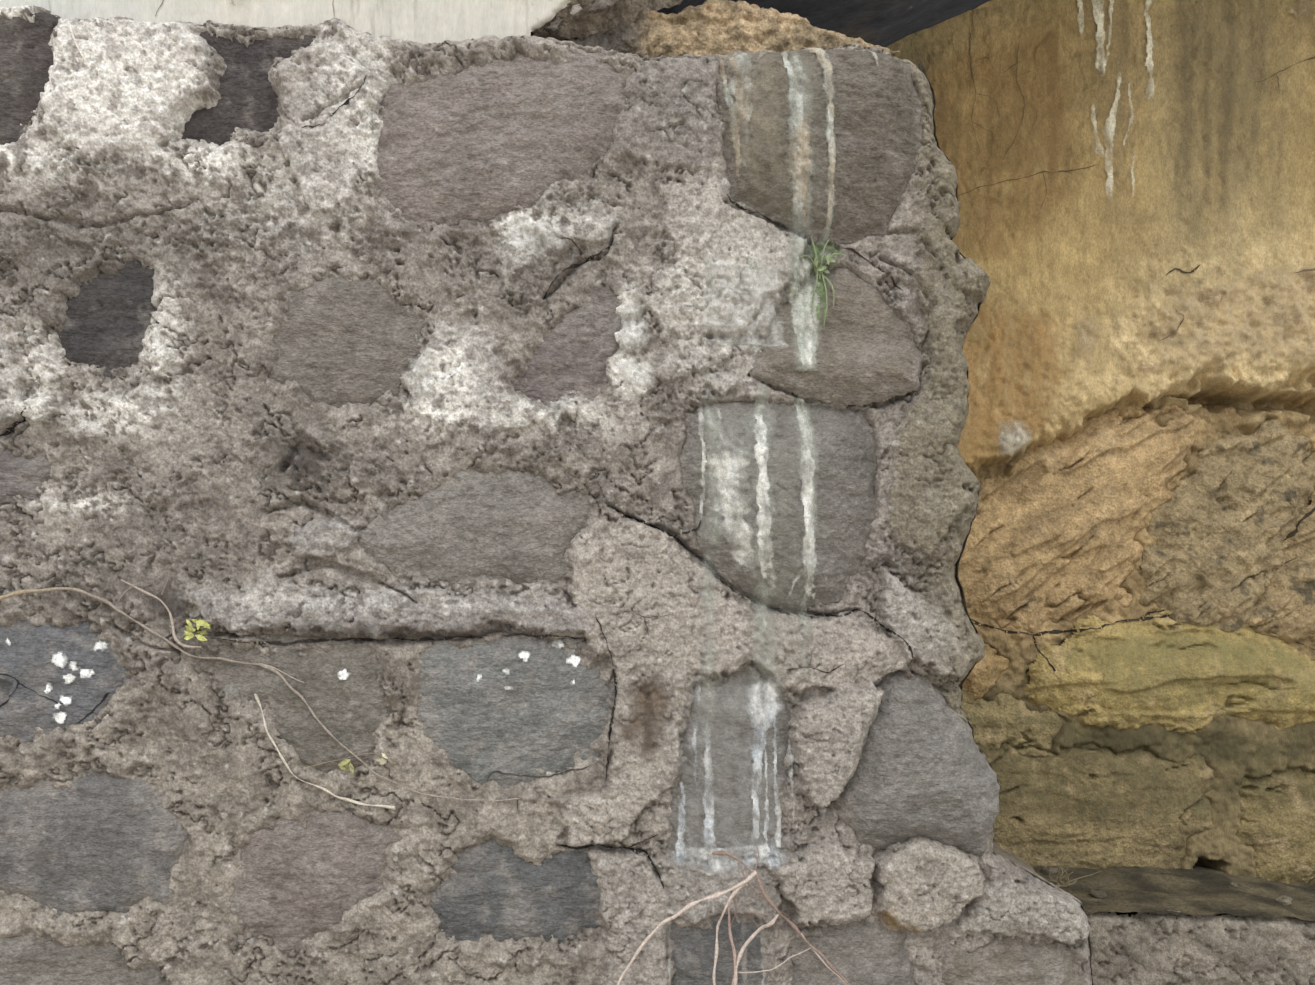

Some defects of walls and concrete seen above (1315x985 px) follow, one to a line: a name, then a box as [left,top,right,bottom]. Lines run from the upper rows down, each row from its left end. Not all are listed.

spalling [533,0,683,41]
damp [1077,0,1154,192]
damp [705,47,838,371]
damp [698,385,775,639]
damp [792,395,816,625]
crack [970,609,1169,671]
damp [675,655,796,871]